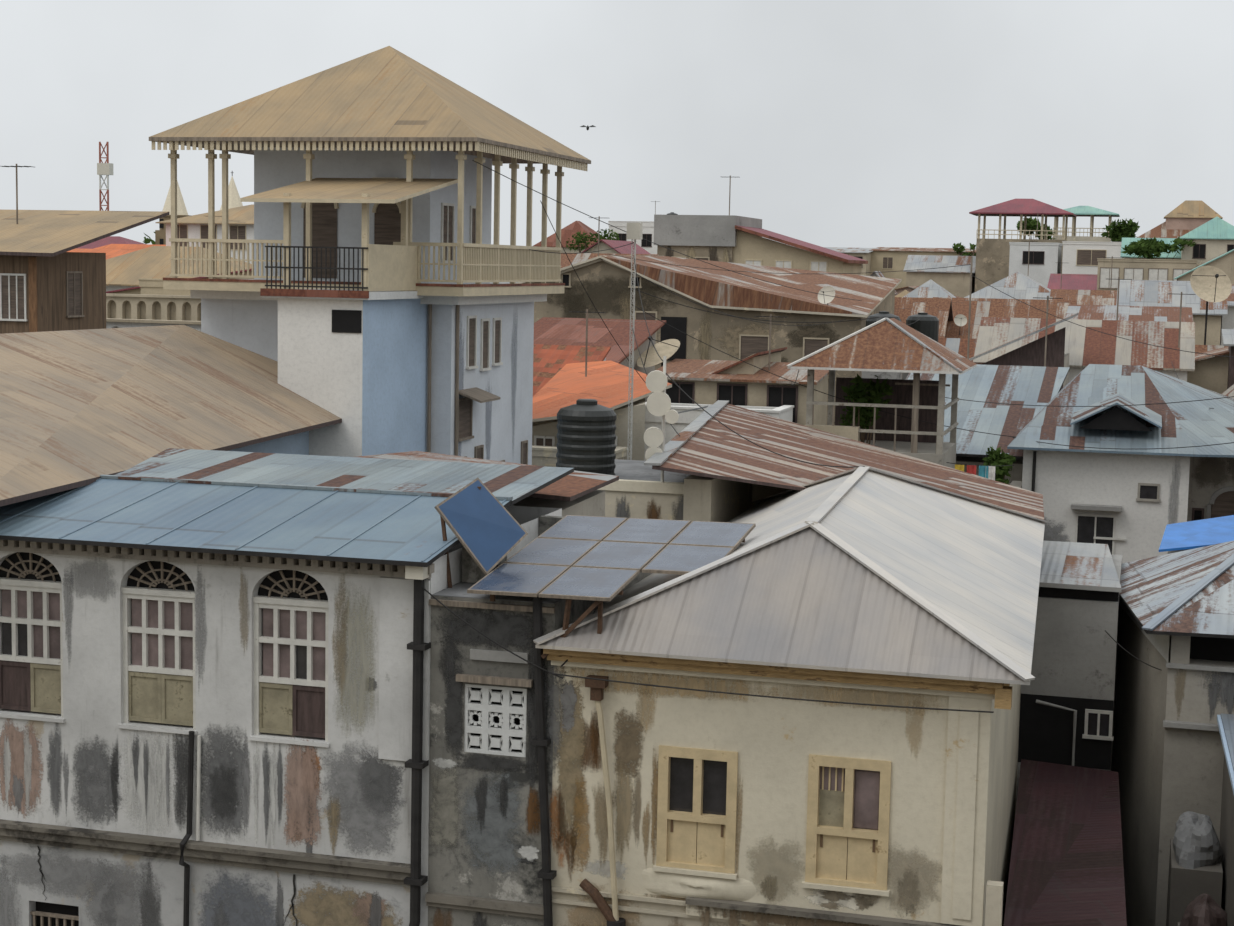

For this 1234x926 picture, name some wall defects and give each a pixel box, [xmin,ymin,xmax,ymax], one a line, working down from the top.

leakage [1204,672,1234,718]
peeling [0,719,44,817]
leakage [47,724,283,837]
peeling [284,740,321,853]
leakage [324,745,405,853]
leakage [580,709,658,863]
crack [37,846,46,900]
leakage [0,857,160,926]
leakage [698,877,879,926]
leakage [899,872,920,910]